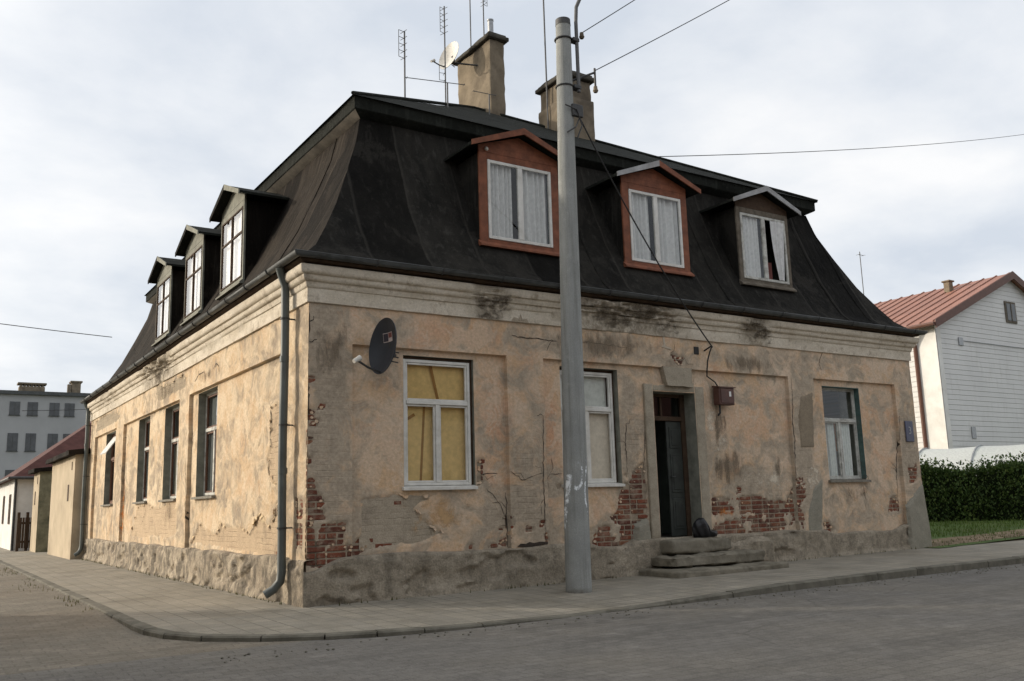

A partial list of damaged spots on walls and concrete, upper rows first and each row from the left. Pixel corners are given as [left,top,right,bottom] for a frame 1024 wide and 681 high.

water stain [478,296,510,319]
water stain [583,298,678,354]
peeling [190,403,444,572]
flaking render [488,513,548,548]
crack [482,414,561,547]
flaking render [592,463,648,546]
flaking render [711,477,806,534]
flaking render [888,496,899,512]
flaking render [908,464,917,484]